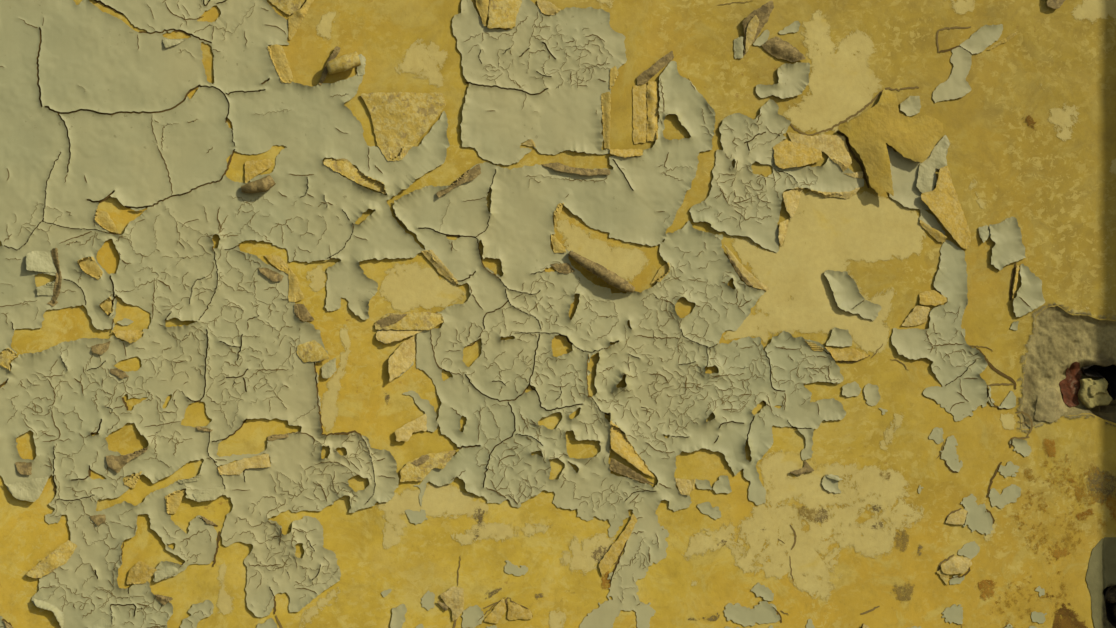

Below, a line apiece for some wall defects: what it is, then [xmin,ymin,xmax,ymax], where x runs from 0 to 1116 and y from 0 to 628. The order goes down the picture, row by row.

crack [95,0,286,57]
crack [464,12,613,114]
peeling [932,24,1018,103]
peeling [1046,0,1116,24]
crack [0,17,394,628]
peeling [0,0,770,628]
peeling [682,0,995,604]
spalling [978,217,1116,434]
peeling [1009,438,1032,457]
crack [439,555,533,628]
peeling [724,582,780,628]